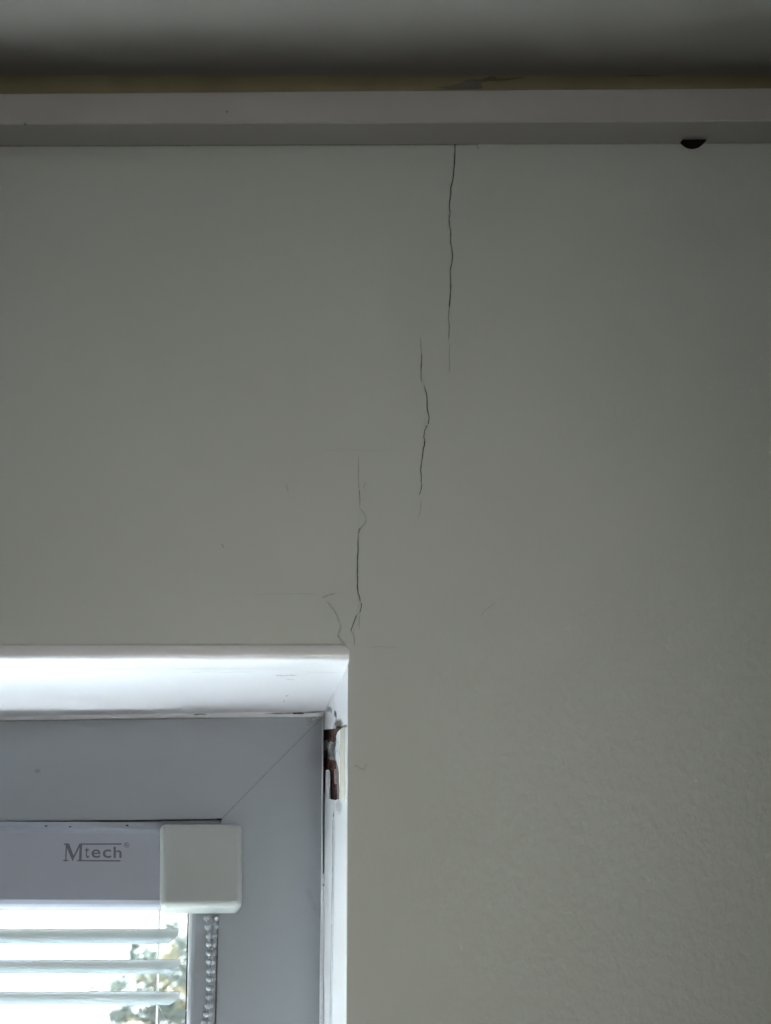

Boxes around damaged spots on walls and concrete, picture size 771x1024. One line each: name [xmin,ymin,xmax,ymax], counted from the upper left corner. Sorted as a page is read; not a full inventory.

crack [447,145,455,338]
crack [419,354,429,494]
crack [351,549,362,630]